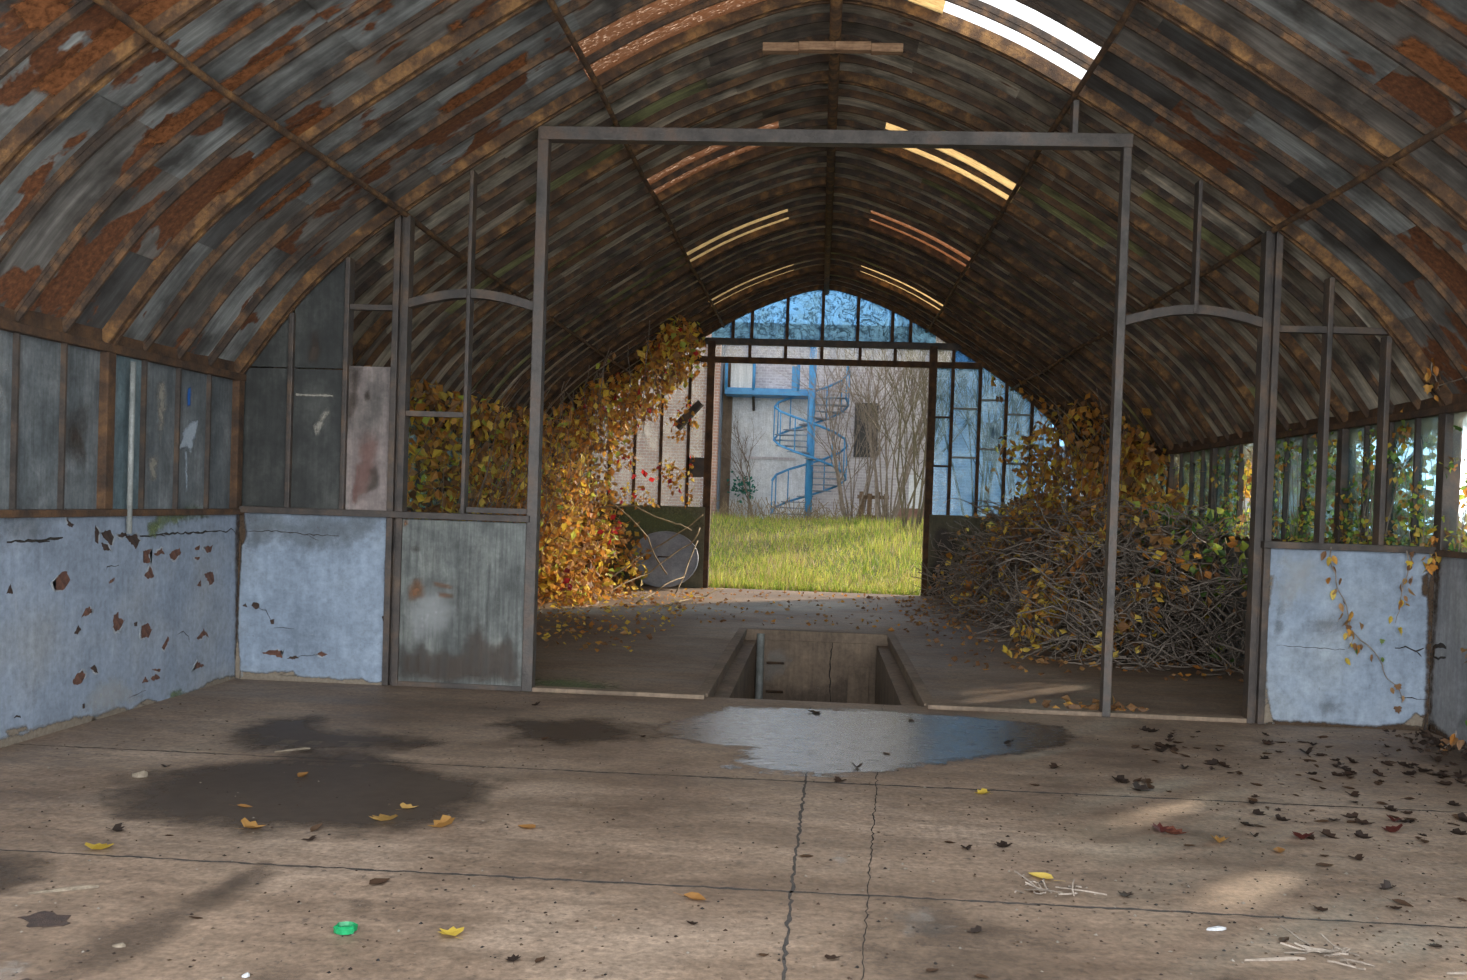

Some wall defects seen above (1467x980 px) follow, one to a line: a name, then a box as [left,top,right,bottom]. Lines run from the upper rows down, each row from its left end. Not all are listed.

corrosion [11,0,73,30]
corrosion [1396,37,1467,99]
flaking render [50,571,70,592]
flaking render [95,526,215,587]
water stain [114,718,487,833]